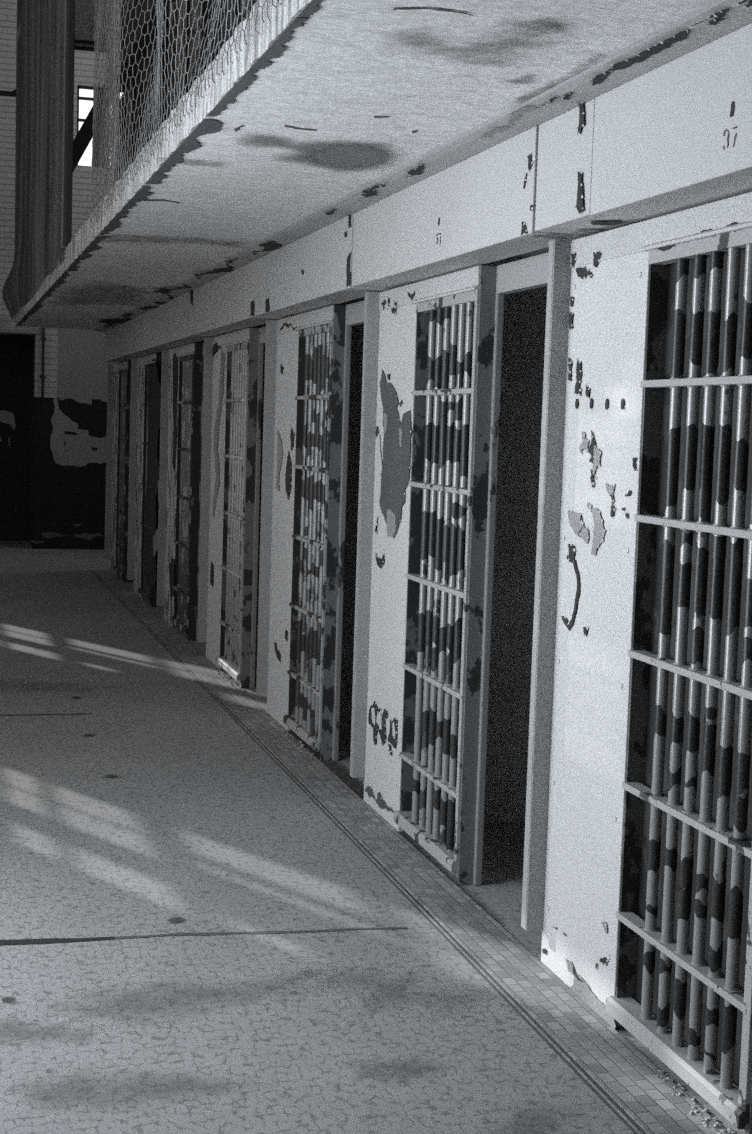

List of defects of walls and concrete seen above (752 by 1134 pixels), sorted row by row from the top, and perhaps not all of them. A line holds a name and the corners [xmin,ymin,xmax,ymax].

damp [248,136,387,171]
peeling [429,307,451,325]
peeling [0,410,16,446]
peeling [50,394,107,467]
peeling [276,344,329,511]
peeling [299,525,324,579]
peeling [374,343,473,538]
peeling [568,430,631,555]
peeling [658,420,752,664]
peeling [274,619,321,667]
peeling [654,702,751,833]
peeling [647,839,743,973]